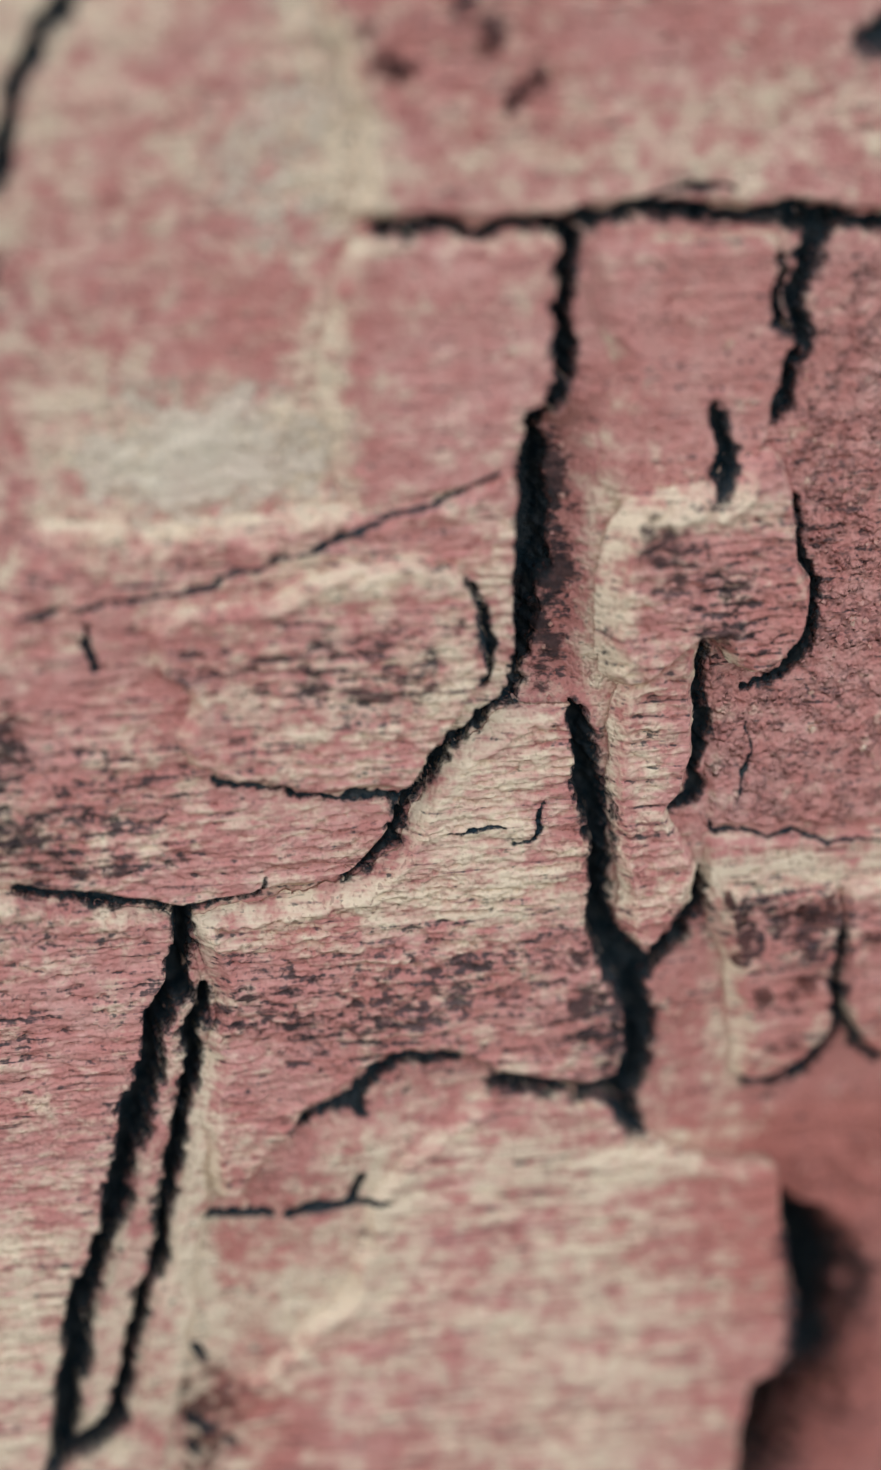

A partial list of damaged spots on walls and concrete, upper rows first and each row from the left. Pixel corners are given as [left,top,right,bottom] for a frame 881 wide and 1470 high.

crack [0,0,76,194]
crack [11,877,393,1470]
peeling [0,224,796,1470]
crack [15,181,881,883]
crack [287,493,881,1139]
spalling [587,229,881,1078]